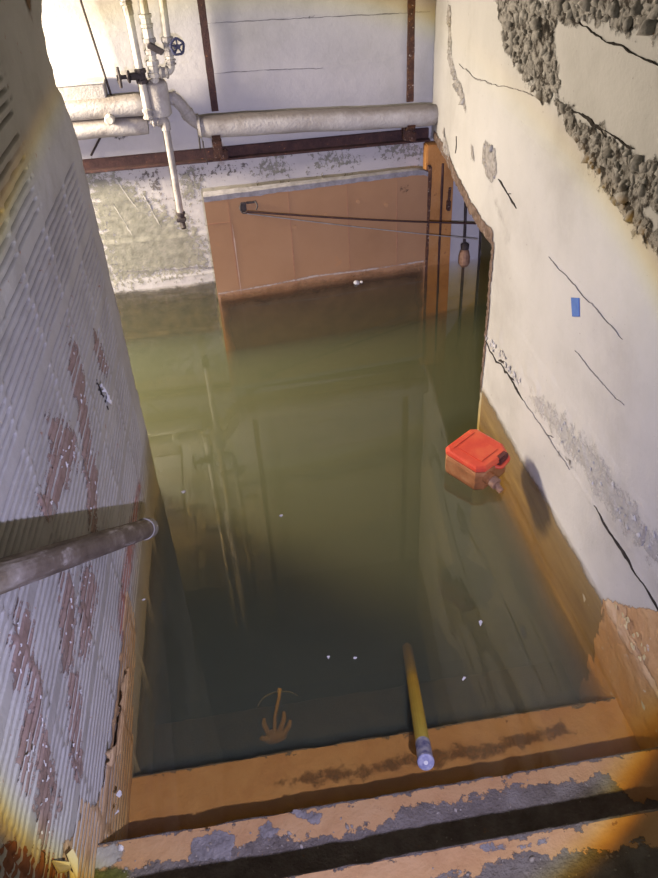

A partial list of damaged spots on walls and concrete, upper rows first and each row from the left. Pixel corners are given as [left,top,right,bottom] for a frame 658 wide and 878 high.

crack [570,19,658,66]
crack [459,64,533,96]
flaking render [497,0,658,241]
crack [559,101,635,149]
peeling [132,169,169,201]
crack [549,257,622,339]
crack [575,350,624,405]
crack [593,505,658,611]
peeling [605,598,658,698]
peeling [0,564,136,878]
peeling [299,755,417,787]
peeling [432,723,568,768]